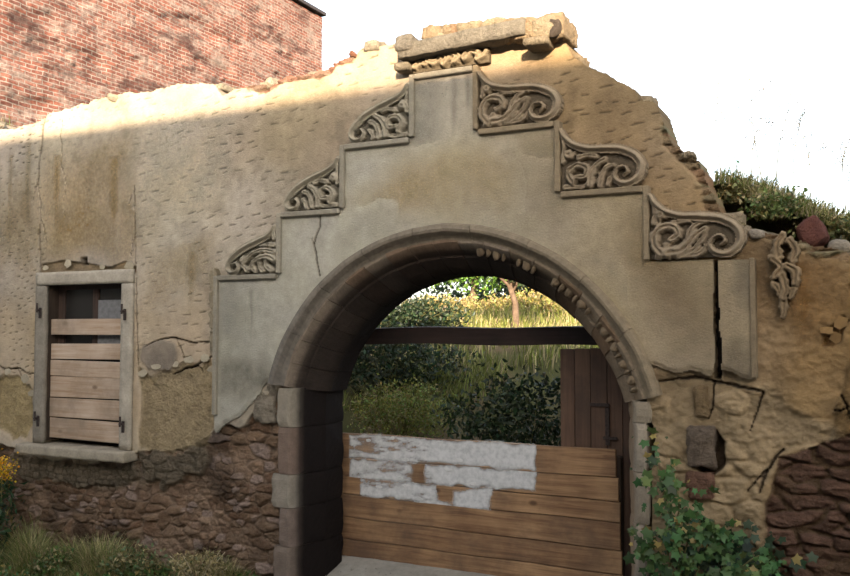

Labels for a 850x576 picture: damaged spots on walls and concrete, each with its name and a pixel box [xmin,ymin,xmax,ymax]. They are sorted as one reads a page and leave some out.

crack [32,118,67,268]
crack [129,186,139,365]
crack [311,215,321,275]
crack [162,337,212,364]
peeling [173,354,212,372]
flaking render [0,386,288,576]
flaking render [764,434,850,576]